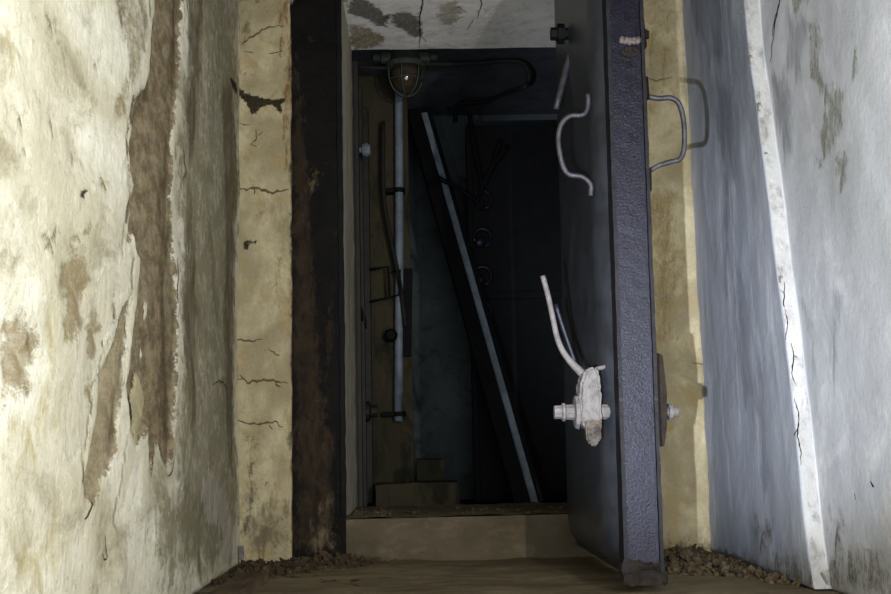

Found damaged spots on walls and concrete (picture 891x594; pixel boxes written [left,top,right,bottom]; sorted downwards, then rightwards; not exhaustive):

crack [417,0,426,47]
crack [770,0,780,61]
crack [228,25,289,195]
water stain [60,227,102,358]
flaking render [65,0,192,531]
water stain [157,0,246,590]
crack [237,338,280,356]
corrosion [279,37,338,552]
crack [214,374,287,459]
water stain [252,503,291,556]